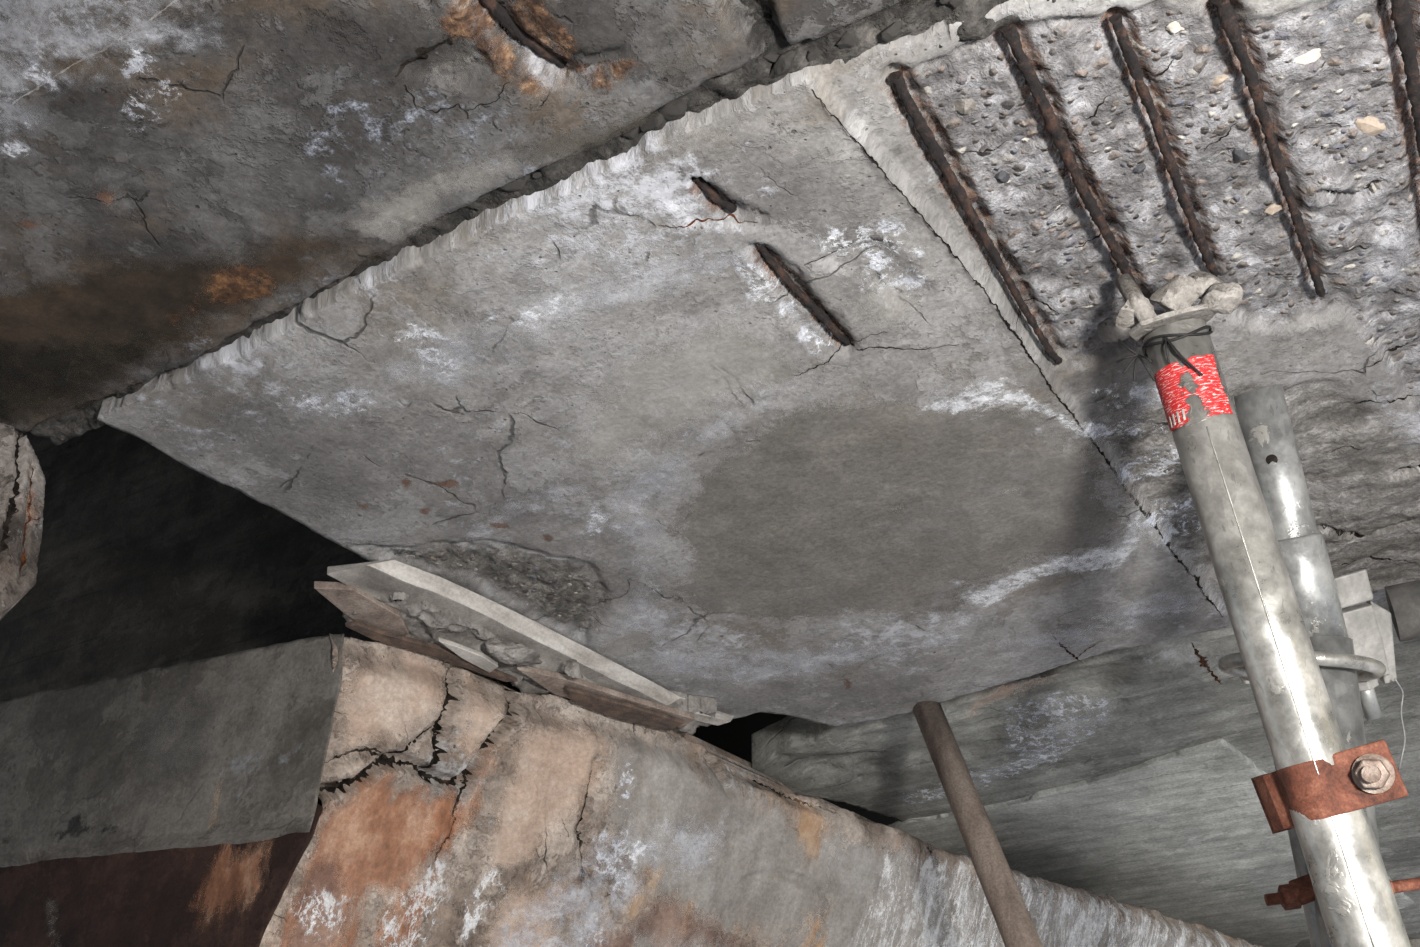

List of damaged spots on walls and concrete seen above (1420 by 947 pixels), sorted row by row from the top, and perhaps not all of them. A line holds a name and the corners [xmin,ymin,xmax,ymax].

water stain [0,0,173,157]
water stain [0,238,342,421]
corrosion [887,66,1058,355]
crack [793,89,1223,617]
corrosion [992,20,1152,295]
spalling [887,0,1420,593]
corrosion [1100,7,1225,267]
crack [0,434,40,580]
corrosion [280,750,494,947]
crack [319,667,512,874]
peeling [439,638,498,673]
water stain [618,377,1201,680]